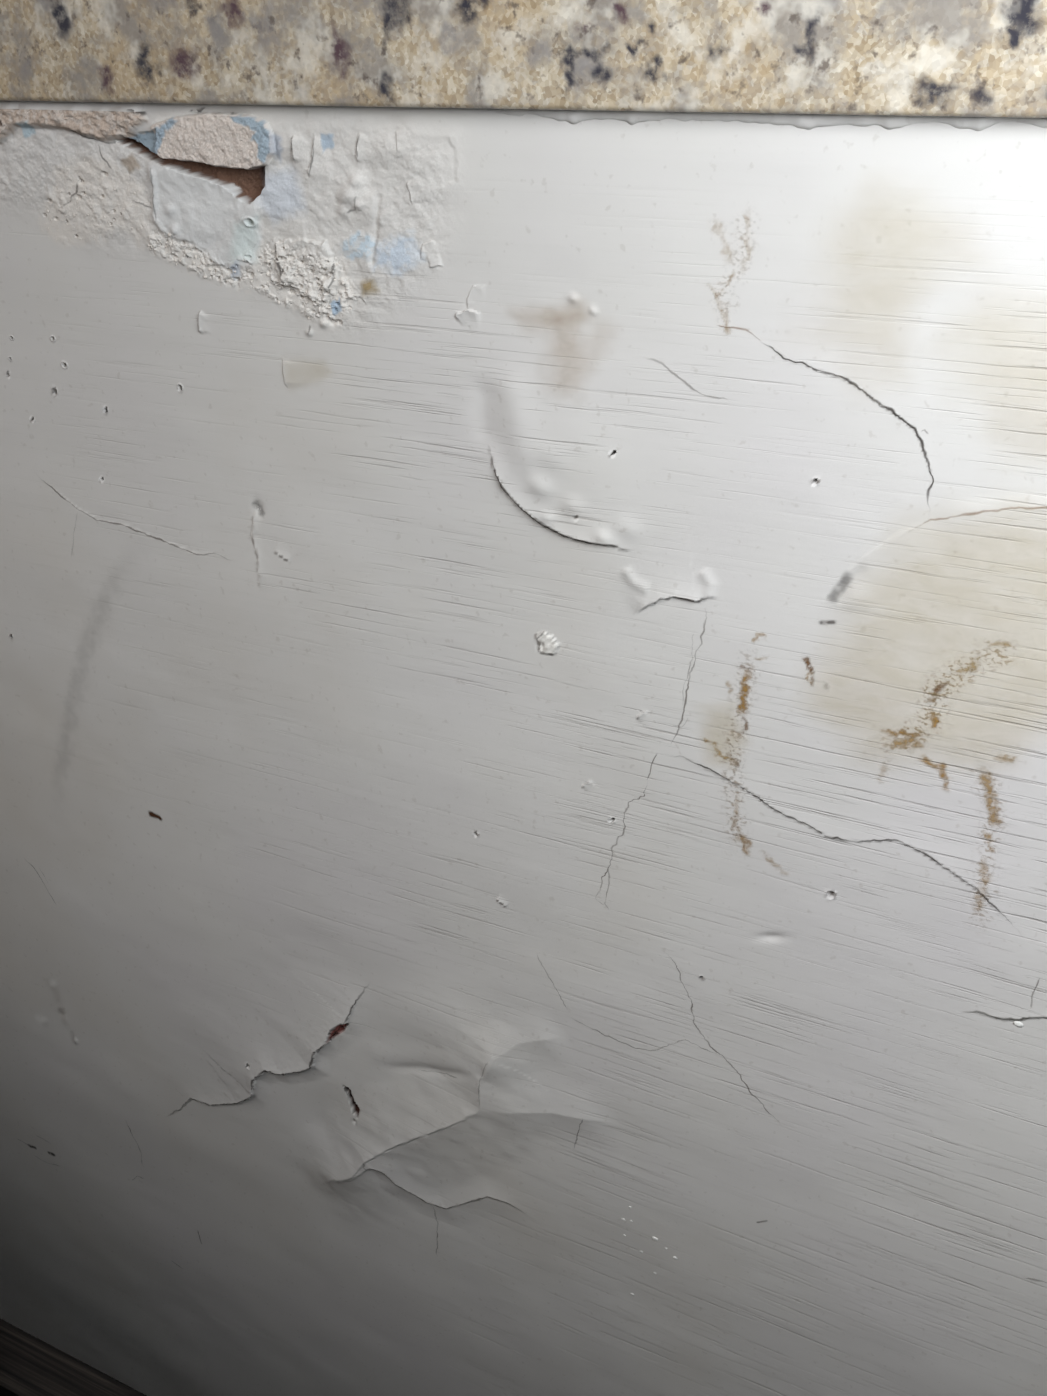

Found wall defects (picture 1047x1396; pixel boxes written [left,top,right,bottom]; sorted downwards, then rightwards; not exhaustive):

flaking render [0,109,466,346]
crack [773,349,934,492]
corrosion [738,677,748,729]
corrosion [890,643,1009,786]
corrosion [981,775,997,838]
peeling [212,980,534,1218]